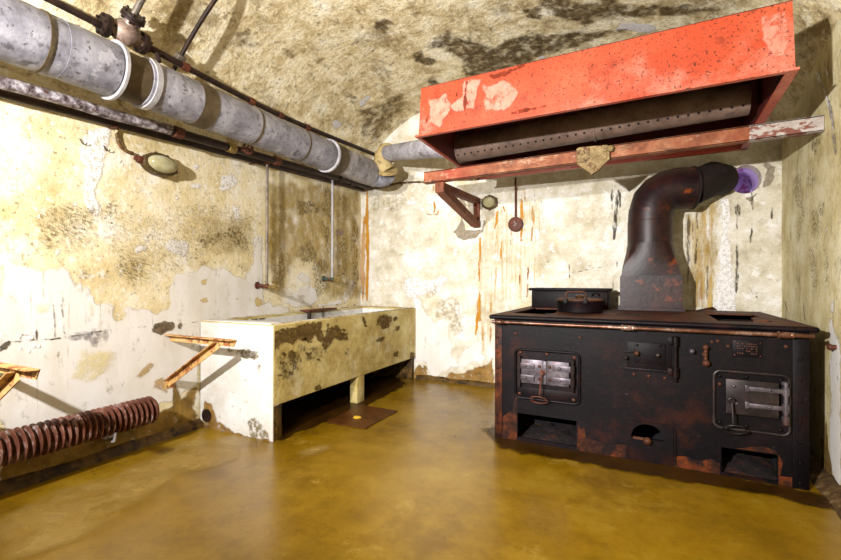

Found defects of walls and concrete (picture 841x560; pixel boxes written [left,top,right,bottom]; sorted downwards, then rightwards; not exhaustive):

peeling [0,75,173,215]
water stain [36,203,93,251]
water stain [268,183,359,295]
corrosion [361,191,369,300]
corrosion [511,191,535,241]
corrosion [475,292,492,340]
water stain [279,346,326,380]